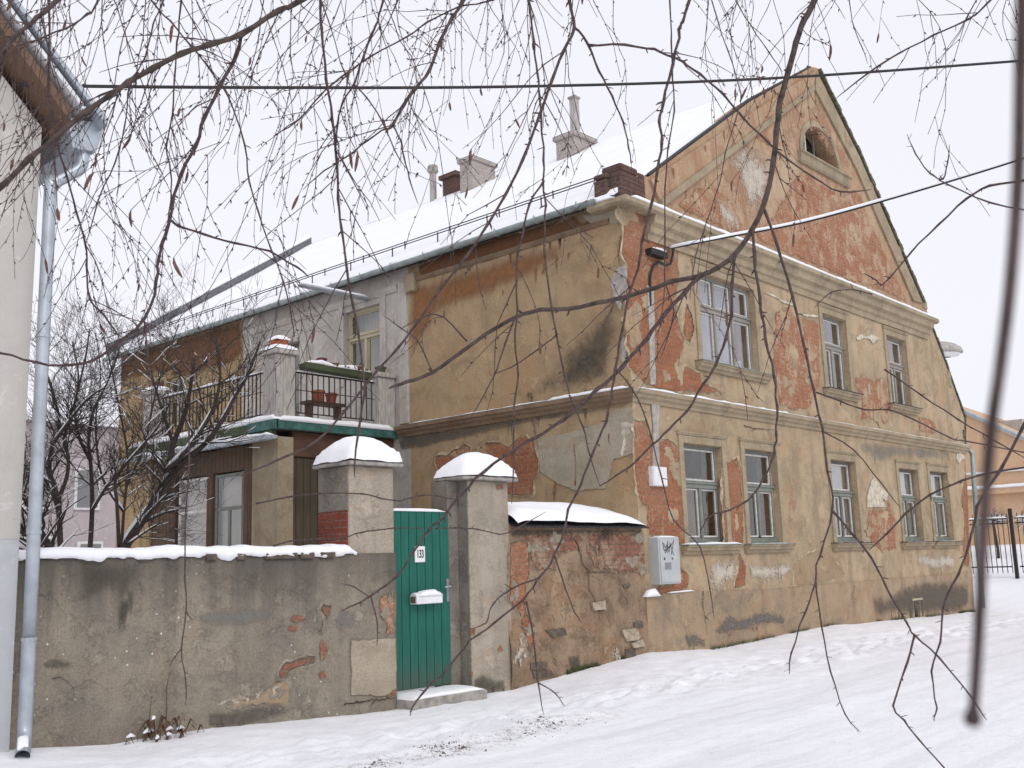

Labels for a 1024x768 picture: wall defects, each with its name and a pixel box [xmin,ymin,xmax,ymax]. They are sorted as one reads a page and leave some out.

spalling [615,206,722,396]
water stain [552,316,610,384]
spalling [763,292,821,411]
spalling [434,434,540,498]
spalling [380,594,395,636]
spalling [507,418,684,679]
spalling [652,566,690,595]
spalling [720,457,746,590]
spalling [865,477,896,553]
flaking render [227,639,328,711]